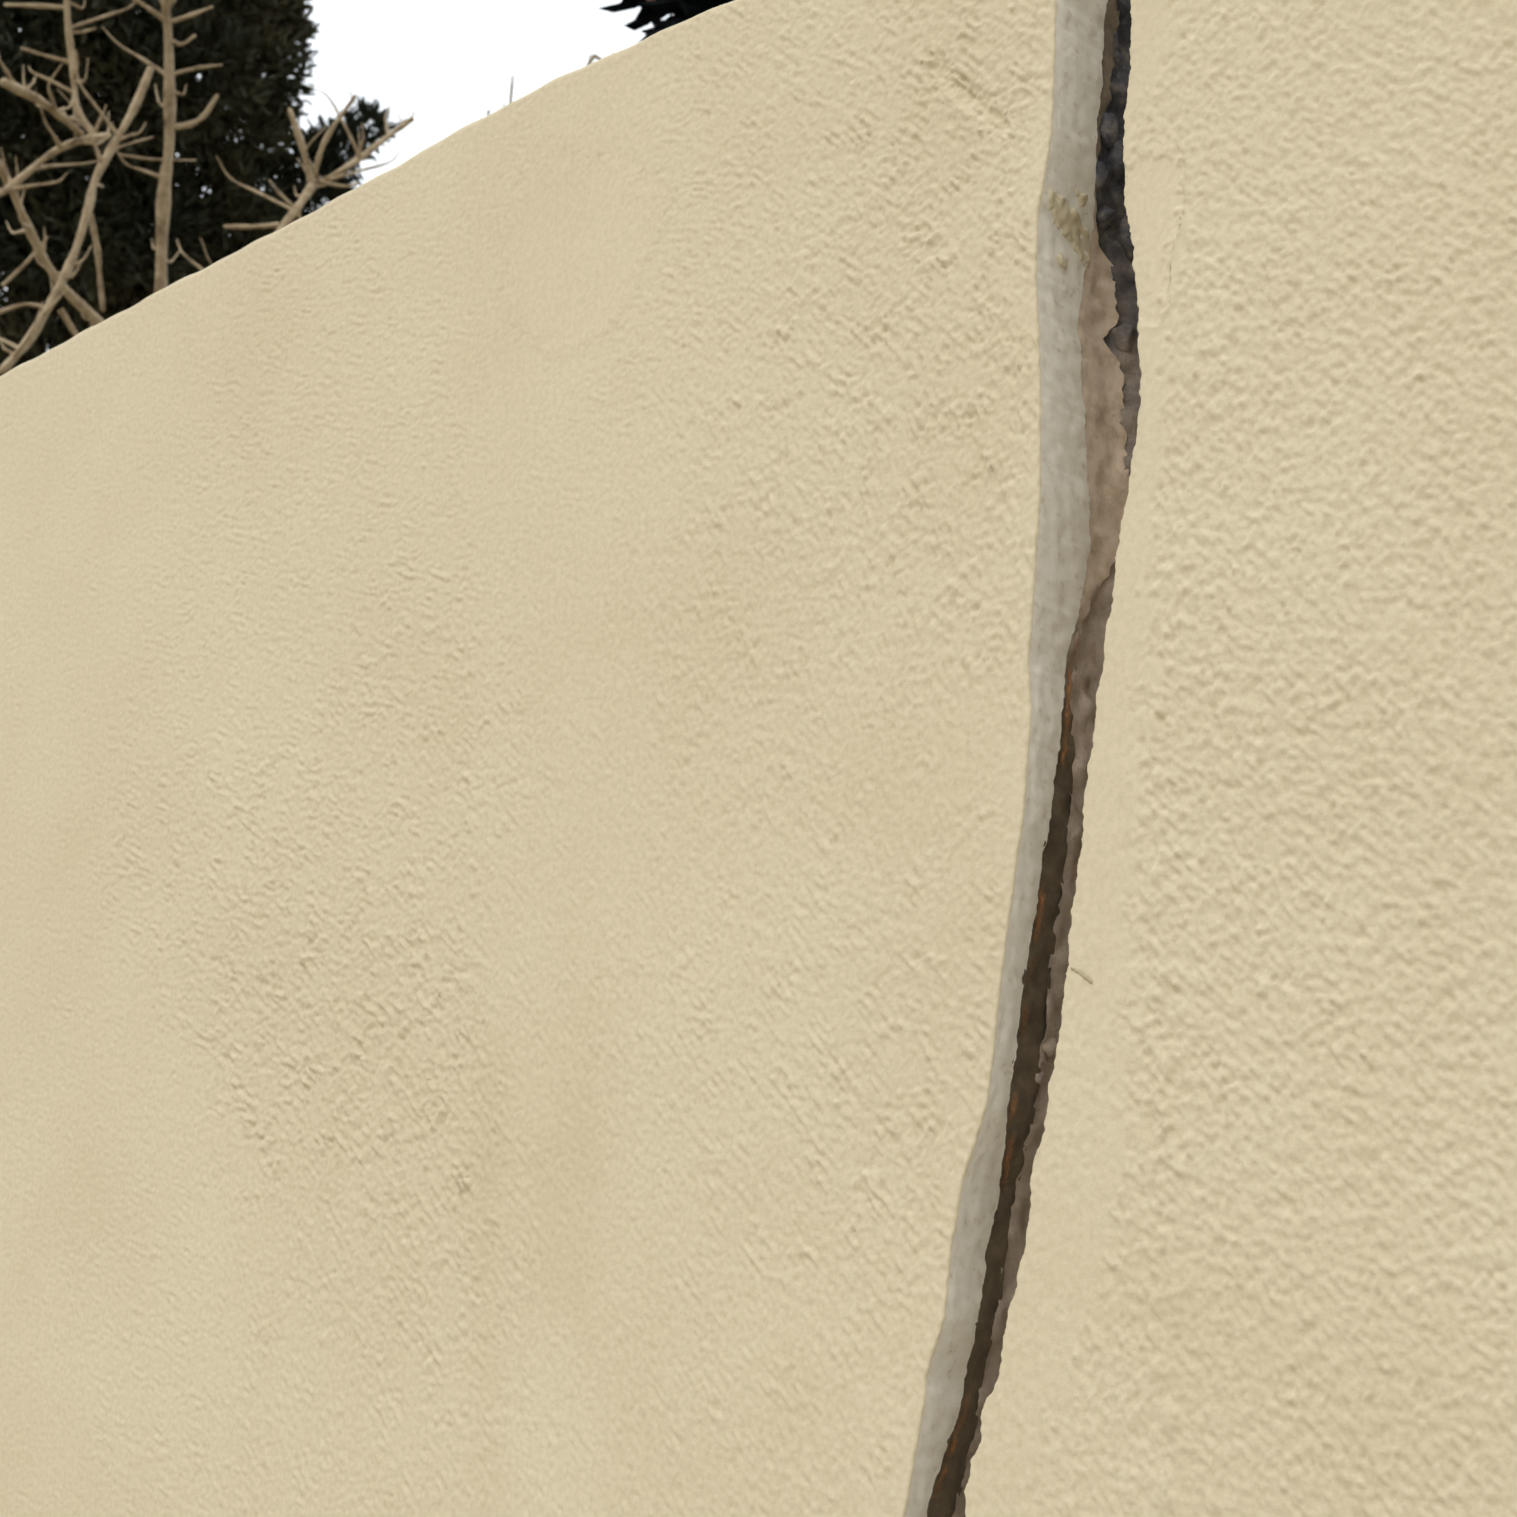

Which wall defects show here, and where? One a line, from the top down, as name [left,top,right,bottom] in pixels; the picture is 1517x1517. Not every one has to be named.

crack [905,0,1142,1517]